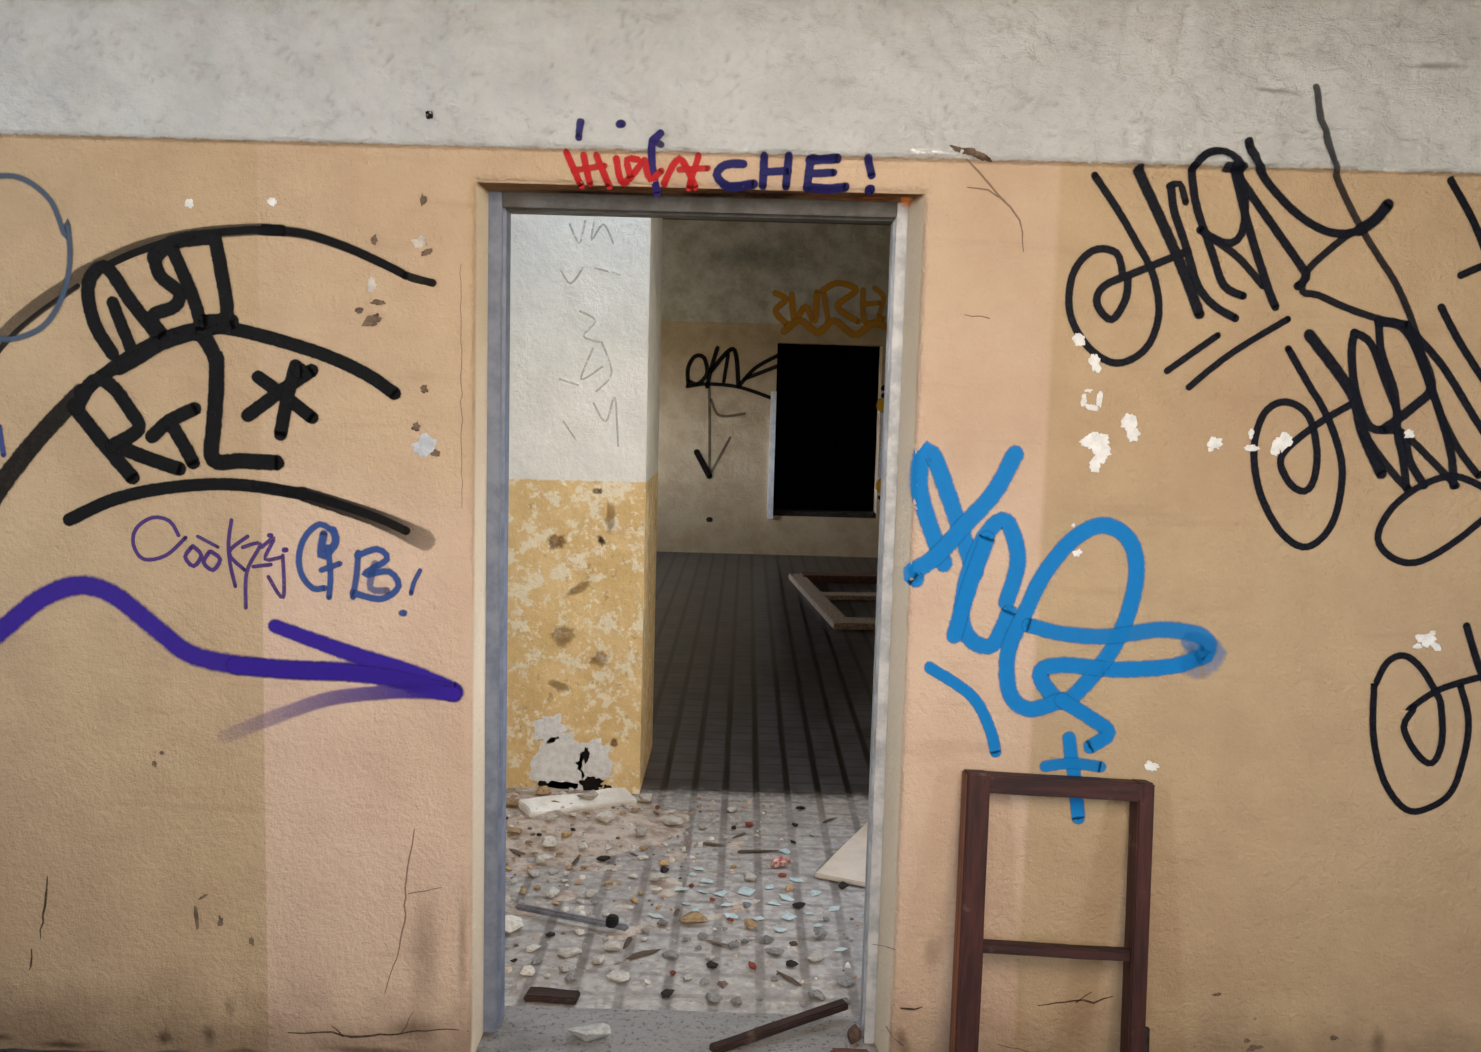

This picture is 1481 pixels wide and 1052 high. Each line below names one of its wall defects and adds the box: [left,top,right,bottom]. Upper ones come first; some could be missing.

peeling [549,536,564,548]
peeling [529,713,617,791]
crack [288,829,458,1038]